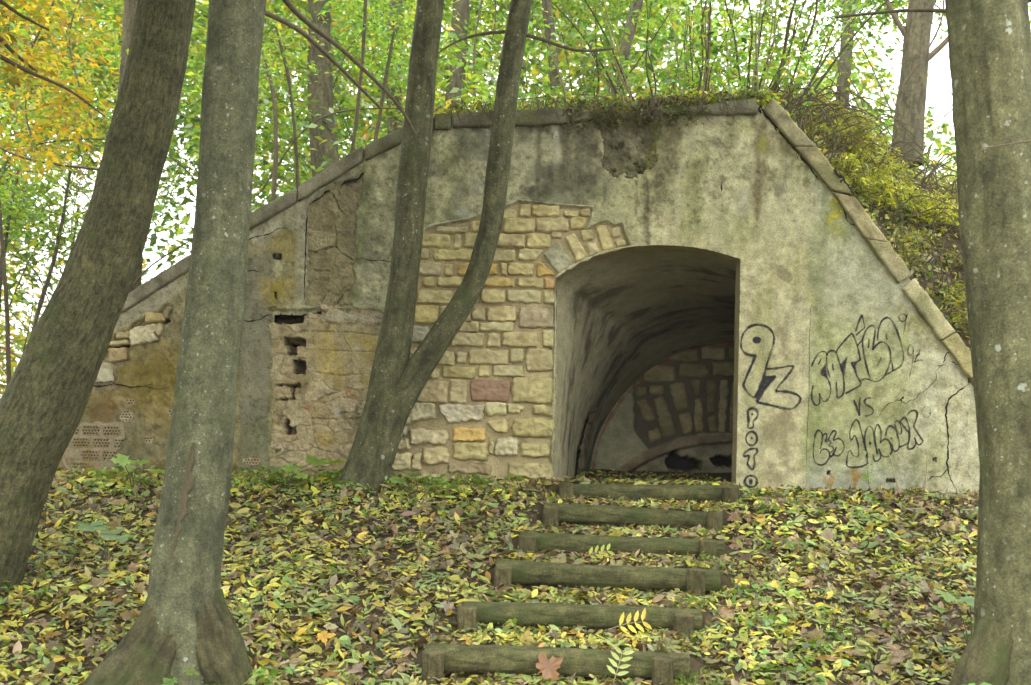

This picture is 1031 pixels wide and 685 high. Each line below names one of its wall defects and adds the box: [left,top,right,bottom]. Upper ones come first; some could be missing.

damp [526,125,598,201]
spalling [58,398,135,474]
spalling [94,305,173,390]
spalling [243,292,383,479]
flaking render [392,199,639,483]
crack [879,352,970,490]